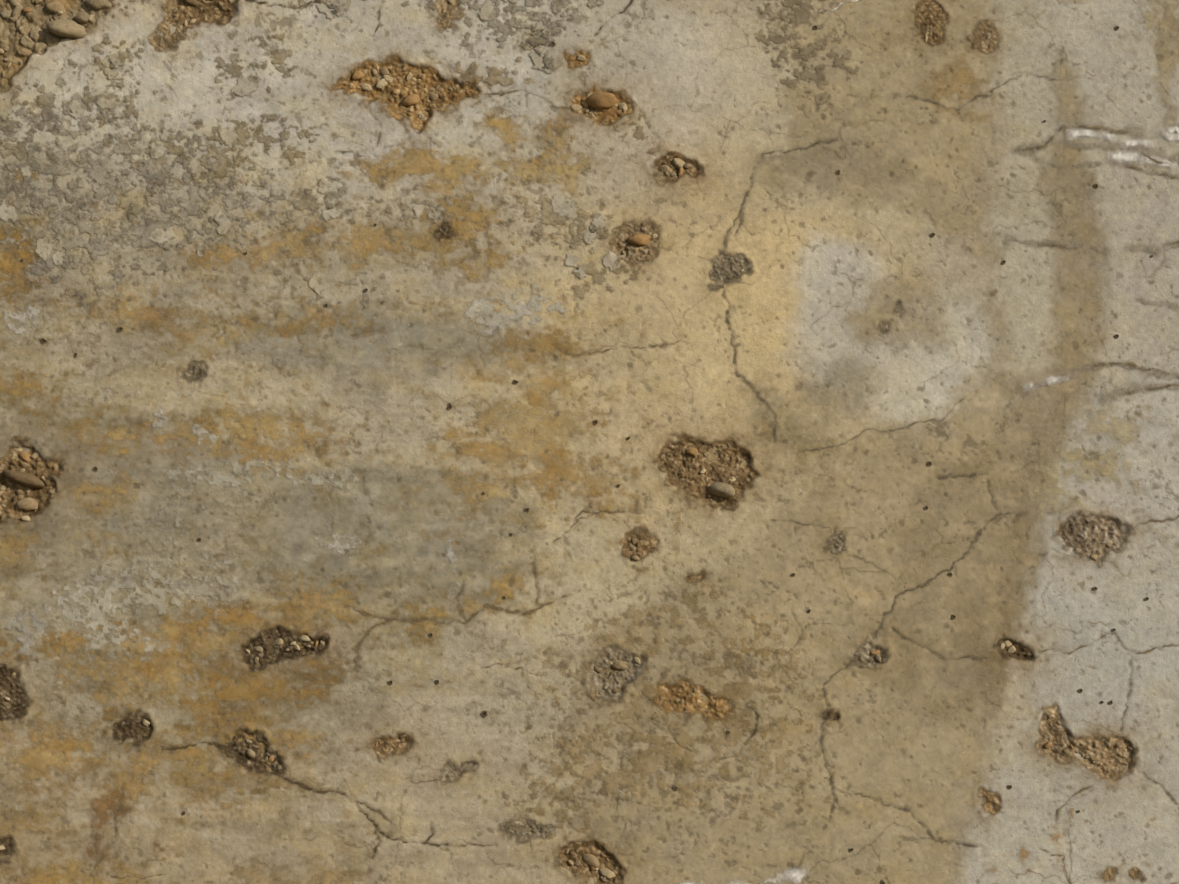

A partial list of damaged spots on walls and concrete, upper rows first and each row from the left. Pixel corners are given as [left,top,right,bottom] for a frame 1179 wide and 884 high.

spalling [333,0,605,131]
peeling [0,0,460,309]
crack [724,139,837,248]
crack [723,291,776,437]
spalling [0,436,62,523]
spalling [656,434,760,511]
crack [853,473,1023,640]
spalling [242,625,330,671]
crack [1042,632,1179,731]
crack [821,657,977,847]
spalling [1036,702,1139,780]
crack [269,766,486,857]